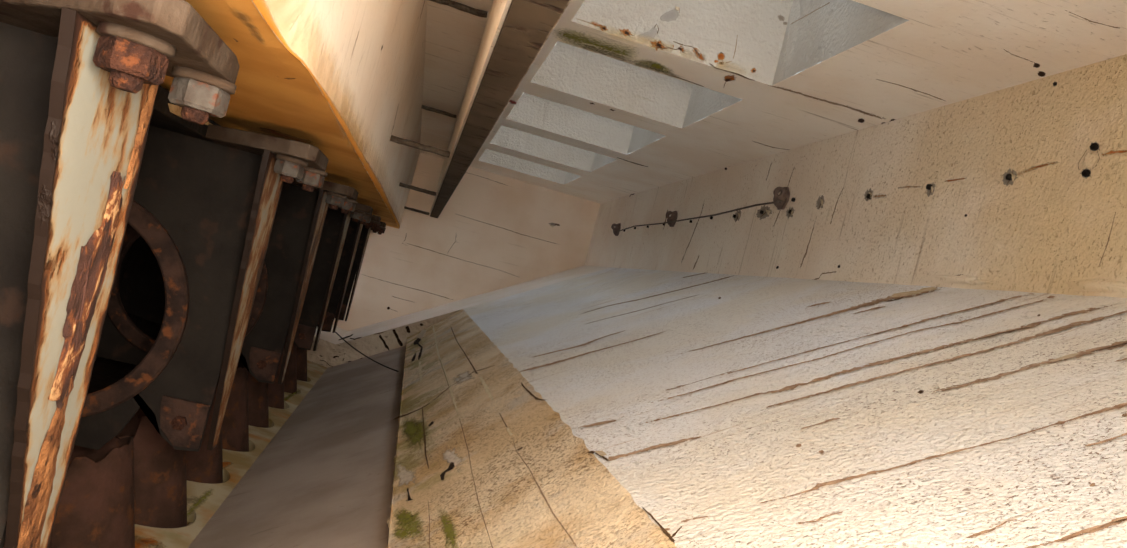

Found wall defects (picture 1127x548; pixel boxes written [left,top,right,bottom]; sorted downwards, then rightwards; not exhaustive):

corrosion [124,85,159,189]